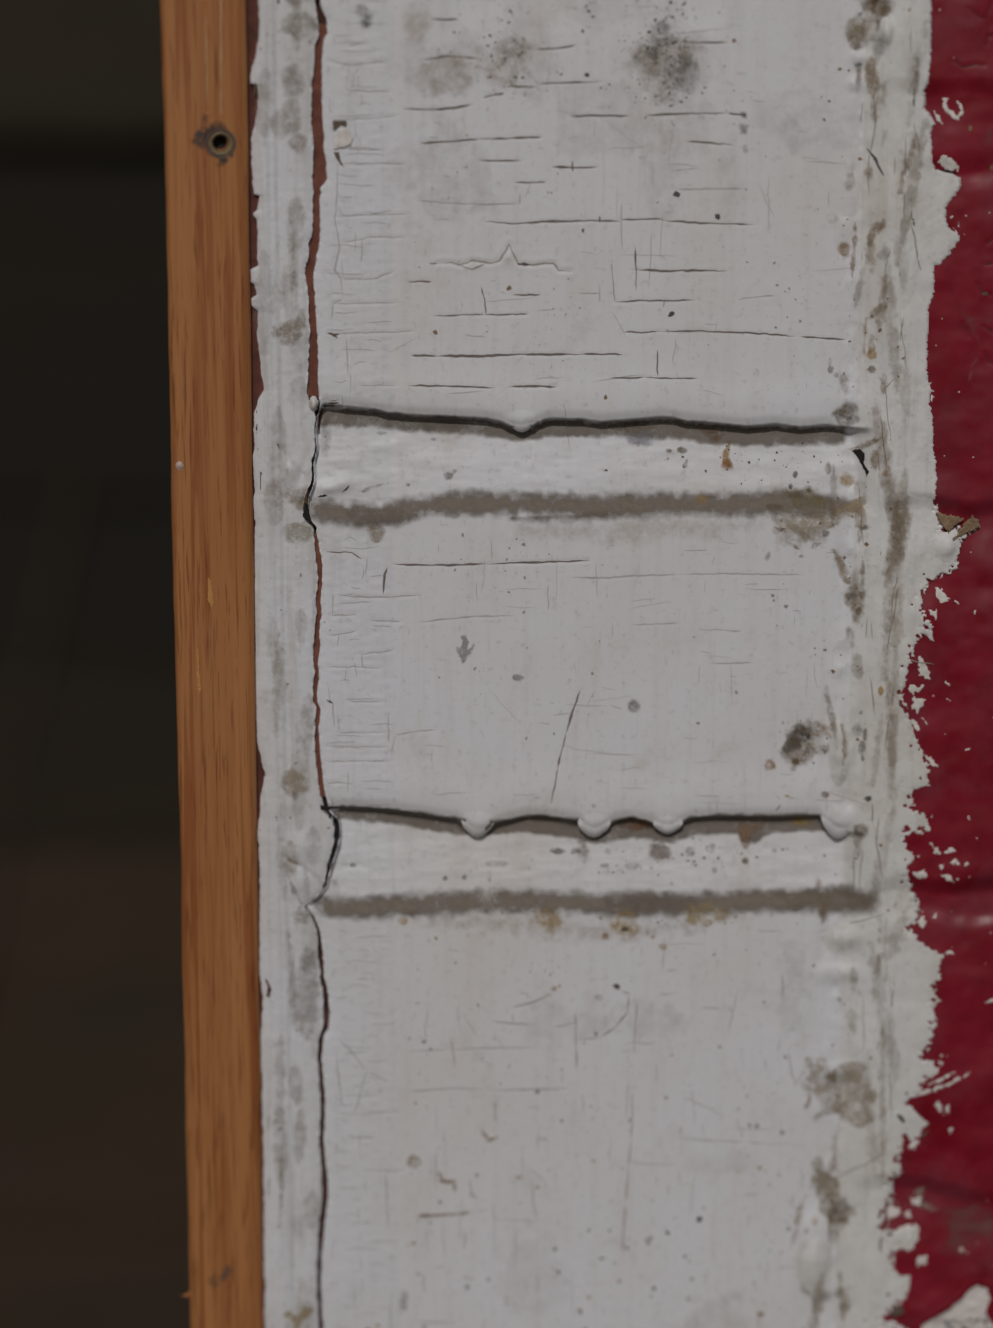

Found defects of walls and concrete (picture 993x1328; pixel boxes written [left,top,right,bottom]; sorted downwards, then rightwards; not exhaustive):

peeling [934,98,964,124]
peeling [937,155,959,174]
peeling [935,587,960,605]
crack [303,0,846,1328]
peeling [908,685,928,731]
peeling [912,848,971,883]
peeling [928,1055,955,1086]
peeling [880,1196,928,1317]
peeling [921,1285,993,1328]